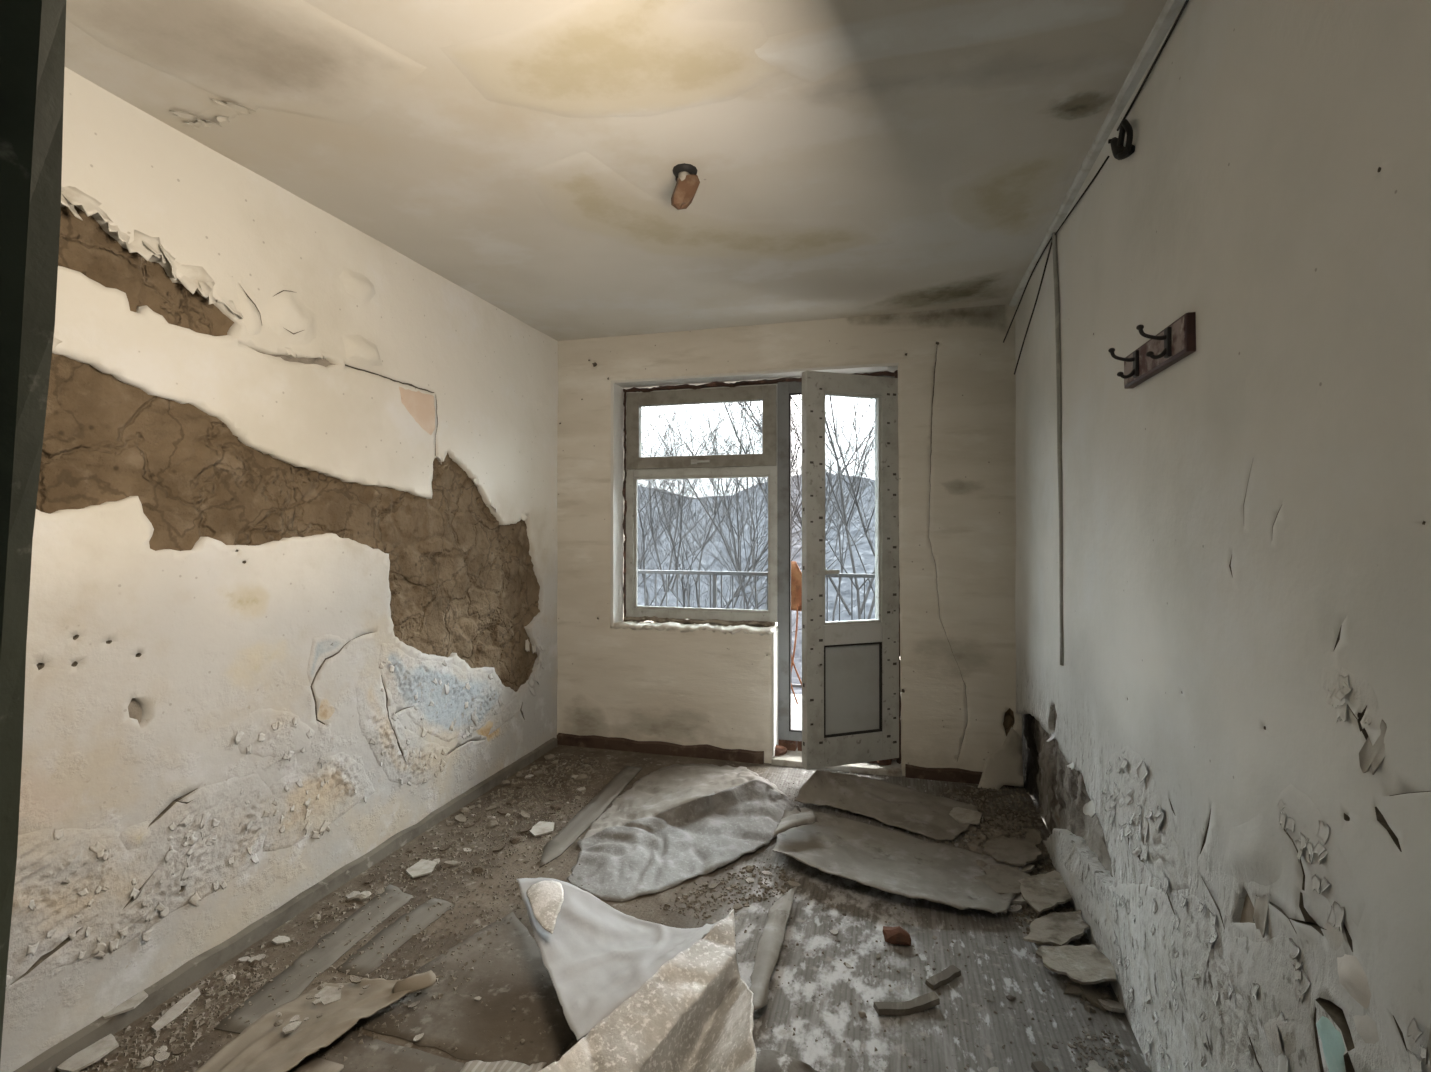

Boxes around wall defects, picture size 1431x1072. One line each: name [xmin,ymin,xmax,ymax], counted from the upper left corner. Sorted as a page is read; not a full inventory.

damp [66,0,426,127]
spalling [58,186,243,336]
damp [522,151,894,264]
damp [939,140,1081,242]
spalling [6,337,540,990]
peeling [1359,719,1387,775]
peeling [1003,708,1346,1072]
peeling [1276,784,1366,933]
peeling [1398,1018,1431,1072]